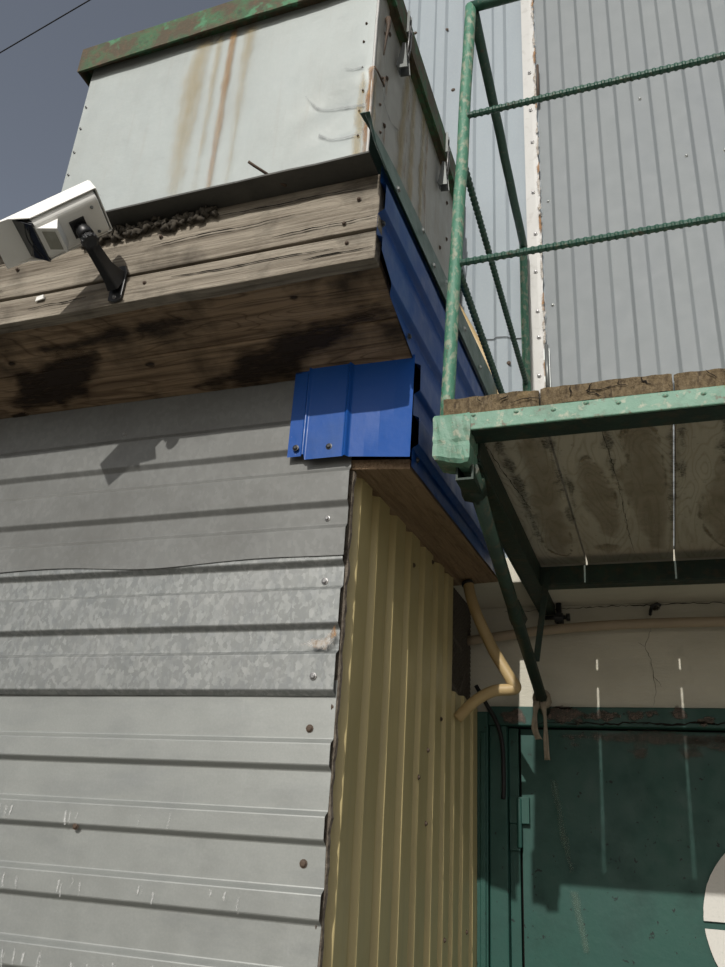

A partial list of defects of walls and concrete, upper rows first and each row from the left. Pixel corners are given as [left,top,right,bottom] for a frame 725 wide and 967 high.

rust [222,30,236,95]
leakage [11,319,184,418]
leakage [194,304,385,389]
crack [506,602,725,726]